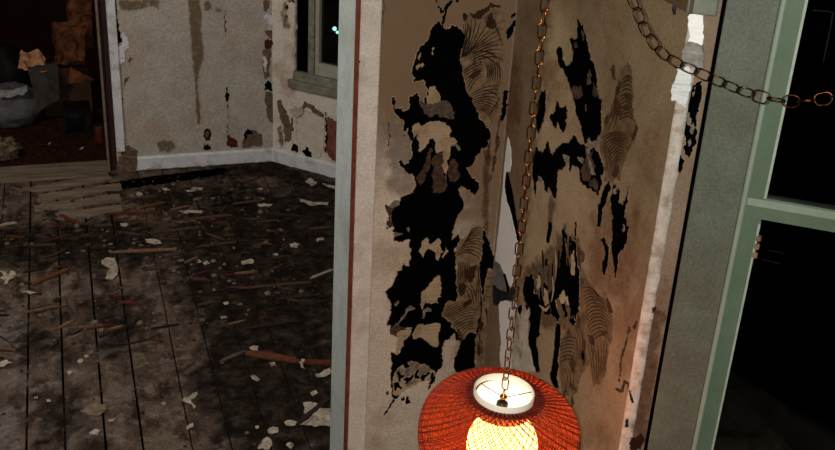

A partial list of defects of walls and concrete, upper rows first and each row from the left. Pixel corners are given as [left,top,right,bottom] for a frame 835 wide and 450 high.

damp [188,0,218,124]
flaking render [262,0,274,124]
peeling [671,14,704,146]
flaking render [291,143,312,157]
peeling [412,86,460,193]
peeling [563,137,601,182]
peeling [385,200,410,237]
peeling [390,275,442,354]
peeling [419,238,449,260]
flaking render [493,137,535,372]
peeling [536,275,548,306]
peeling [392,361,435,396]